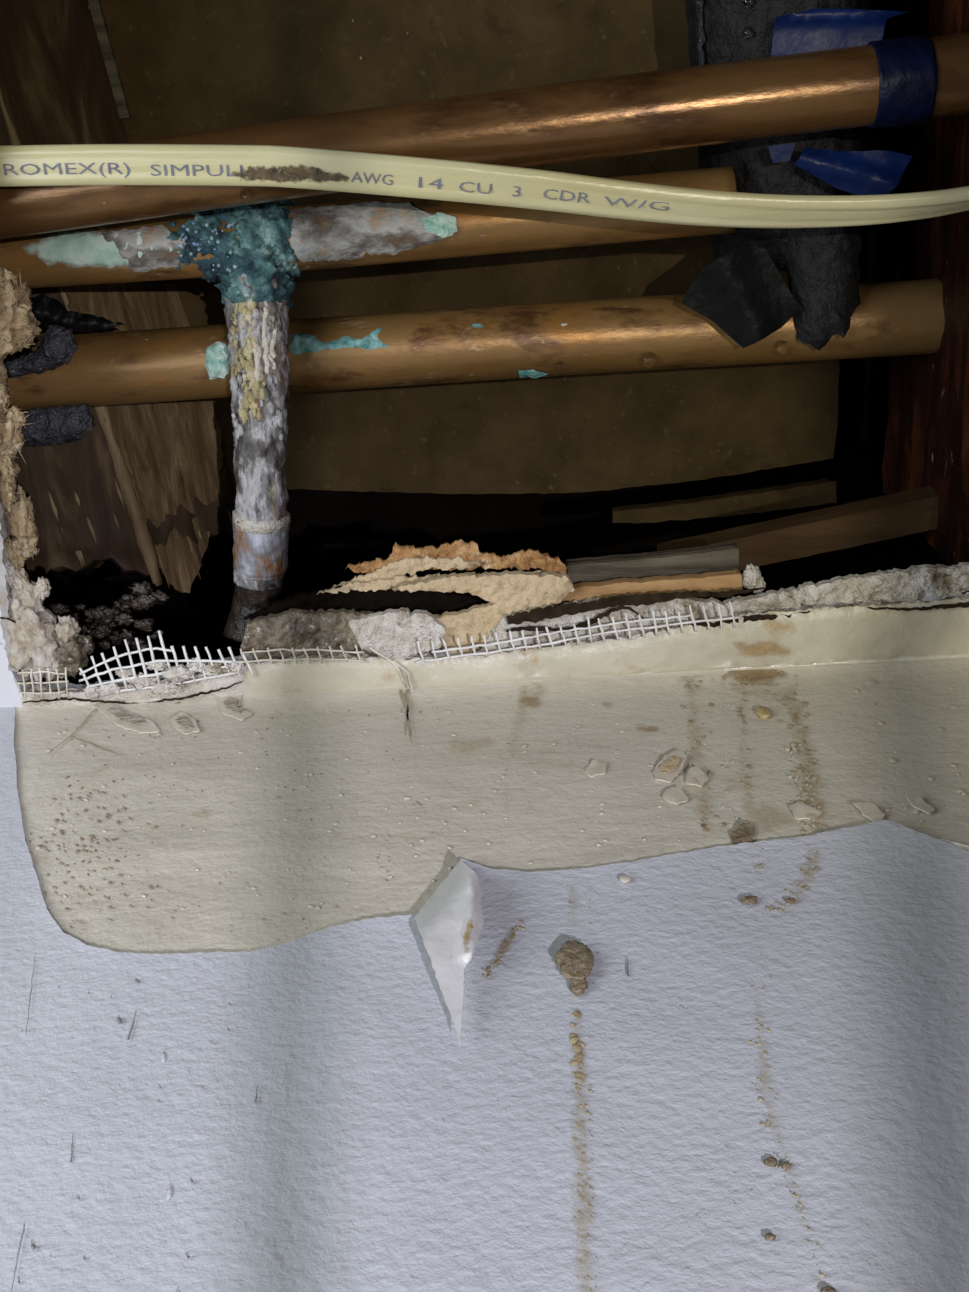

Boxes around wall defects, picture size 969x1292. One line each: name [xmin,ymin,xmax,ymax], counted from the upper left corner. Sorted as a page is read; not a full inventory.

spalling [0,354,10,418]
peeling [0,503,969,954]
water stain [678,679,753,837]
water stain [764,683,831,918]
water stain [569,1011,598,1292]
water stain [748,982,825,1277]